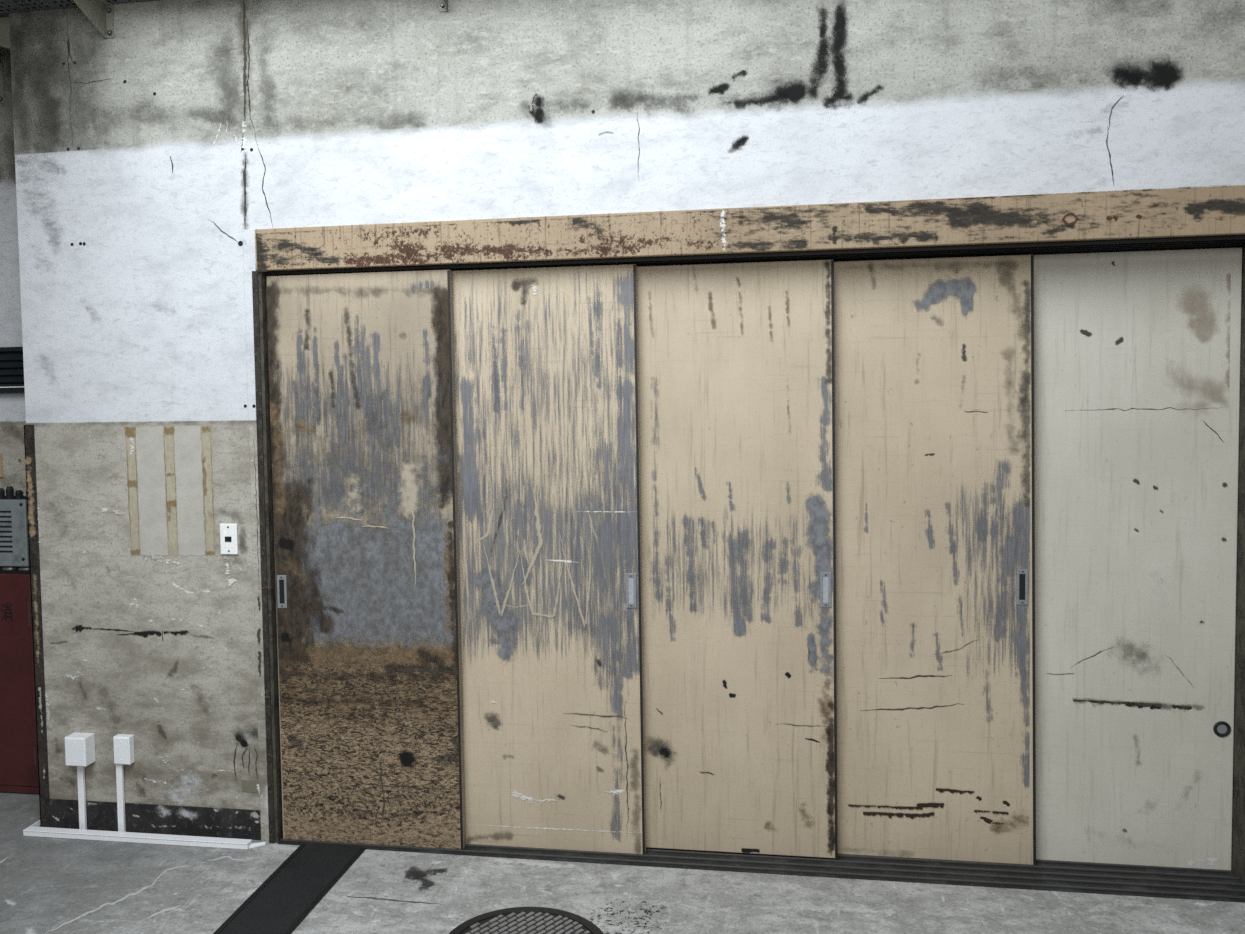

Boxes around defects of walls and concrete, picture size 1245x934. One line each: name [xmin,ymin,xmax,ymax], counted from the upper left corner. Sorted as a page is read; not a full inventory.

crack [210,0,273,242]
damp [808,5,852,108]
crack [1106,95,1124,184]
corrosion [256,211,741,849]
corrosion [781,682,835,852]